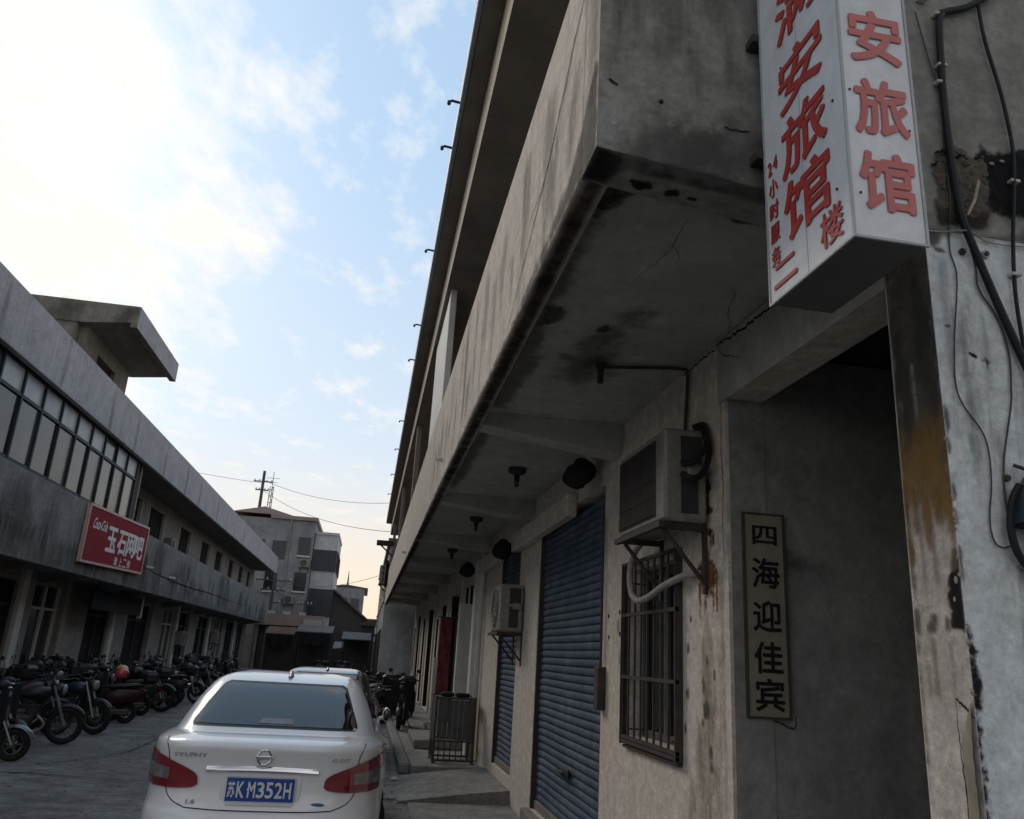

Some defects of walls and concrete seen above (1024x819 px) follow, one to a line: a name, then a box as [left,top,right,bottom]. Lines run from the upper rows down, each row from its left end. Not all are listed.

spalling [929,145,1004,252]
leakage [386,64,765,604]
crack [682,288,774,377]
corrosion [899,410,955,548]
corrosion [698,550,718,616]
spalling [915,546,990,819]